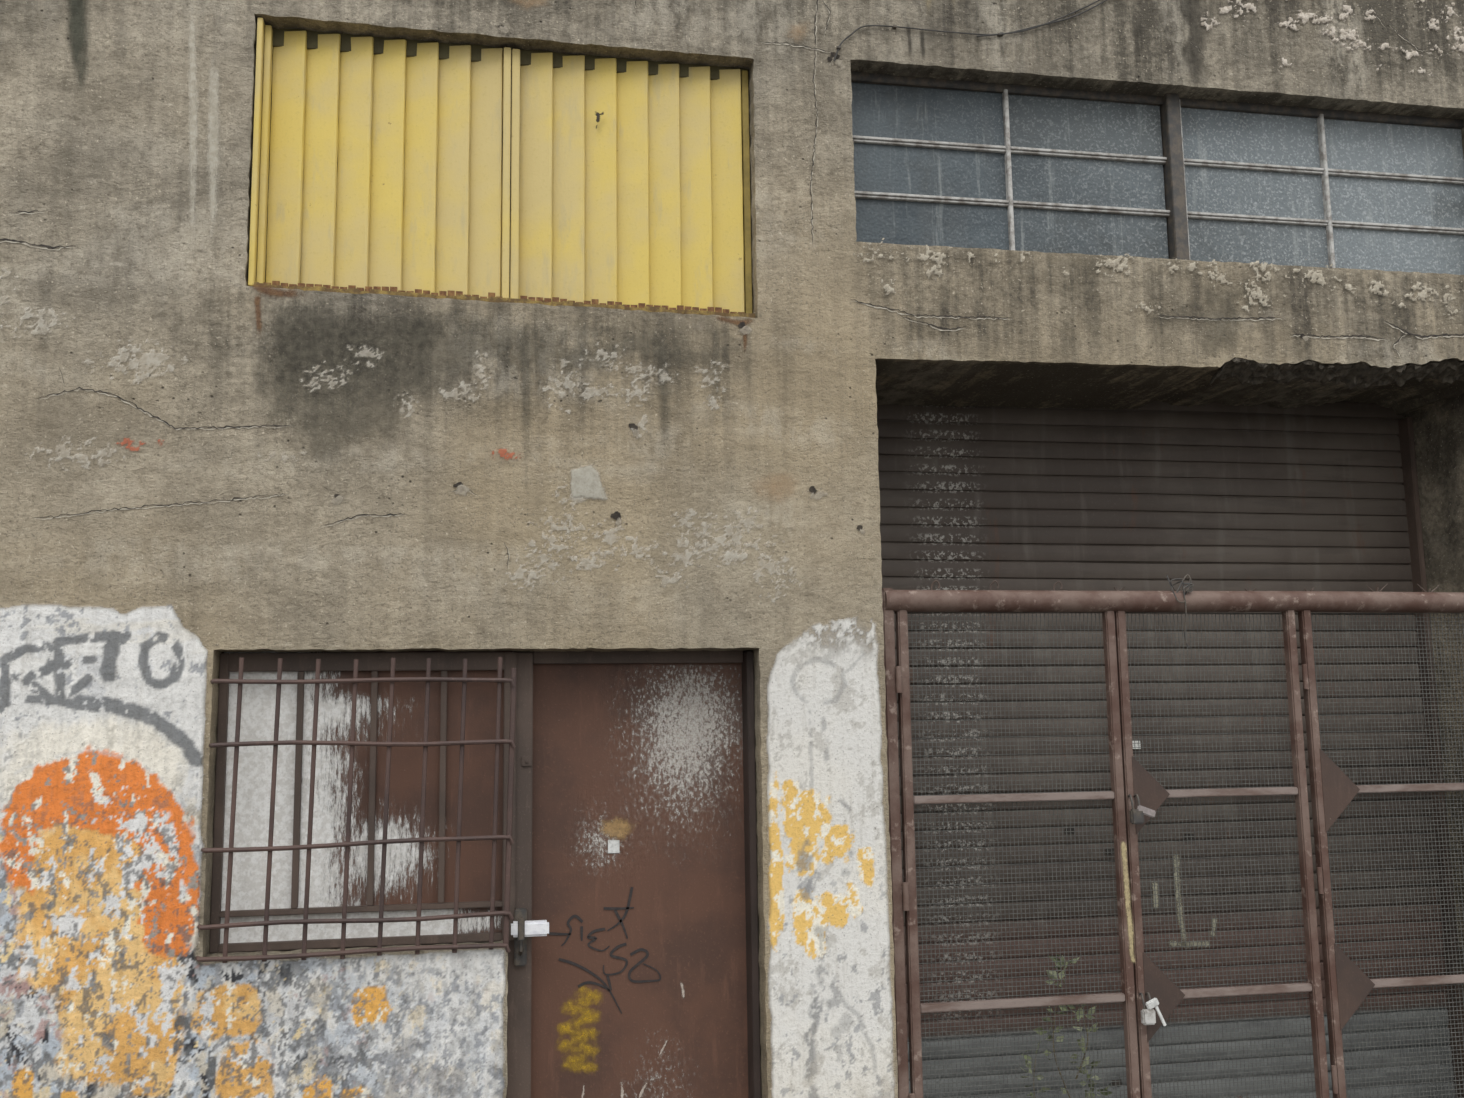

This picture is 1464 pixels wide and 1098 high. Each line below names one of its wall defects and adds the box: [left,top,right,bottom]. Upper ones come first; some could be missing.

damp [70,0,86,80]
damp [1182,0,1202,79]
flaking render [1201,0,1258,31]
flaking render [1279,0,1464,75]
flaking render [853,238,949,281]
flaking render [1092,254,1143,277]
flaking render [1162,258,1460,319]
crack [1159,315,1464,358]
crack [37,365,296,430]
crack [32,493,285,520]
peeling [75,653,107,701]
peeling [0,715,504,1098]